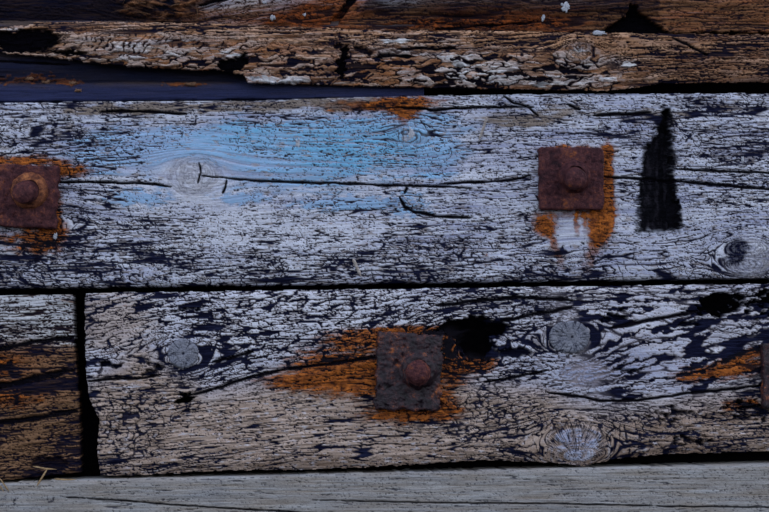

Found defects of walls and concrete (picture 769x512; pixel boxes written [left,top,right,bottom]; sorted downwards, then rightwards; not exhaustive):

crack [200,0,227,8]
rust [344,96,446,122]
rust [0,154,87,178]
crack [60,180,171,188]
crack [197,163,531,219]
rust [533,143,617,249]
crack [604,169,769,190]
rust [0,197,69,254]
crack [212,351,254,363]
crack [184,357,376,397]
rust [262,325,499,425]
rust [676,348,761,381]